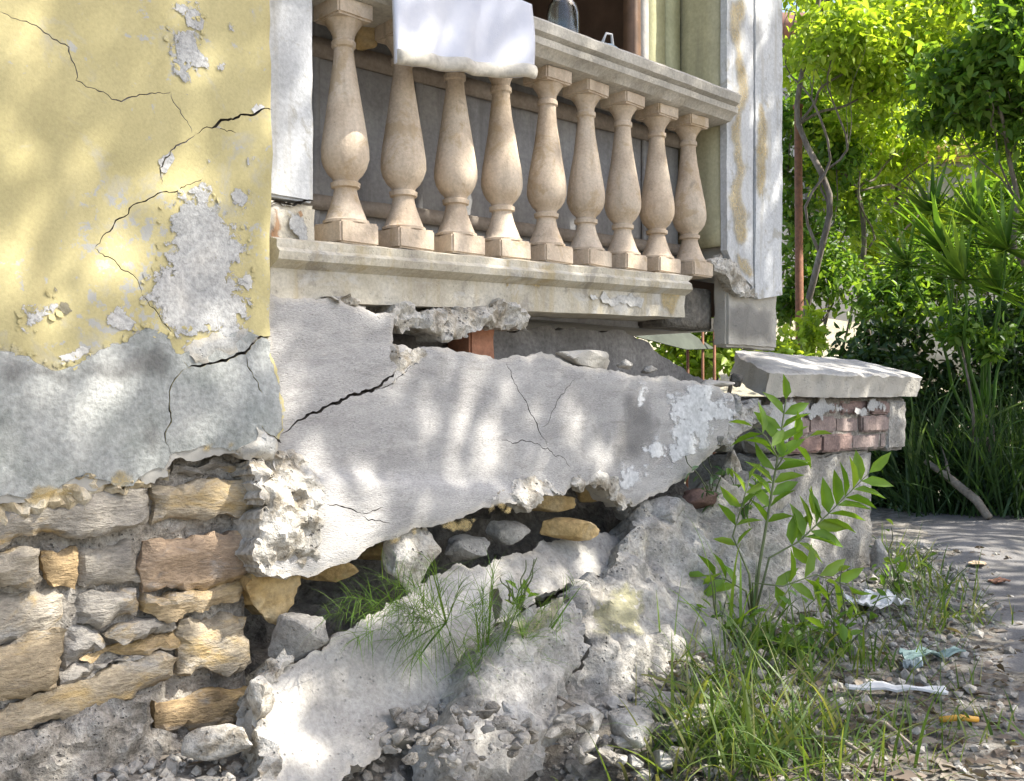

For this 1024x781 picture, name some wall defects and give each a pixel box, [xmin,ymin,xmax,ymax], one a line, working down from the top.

peeling [164,1,225,83]
crack [0,11,272,331]
flaking render [0,182,325,580]
crack [164,336,272,437]
crack [268,363,416,443]
crack [507,366,572,468]
spalling [714,394,886,452]
spalling [236,648,295,719]
spalling [239,716,283,781]